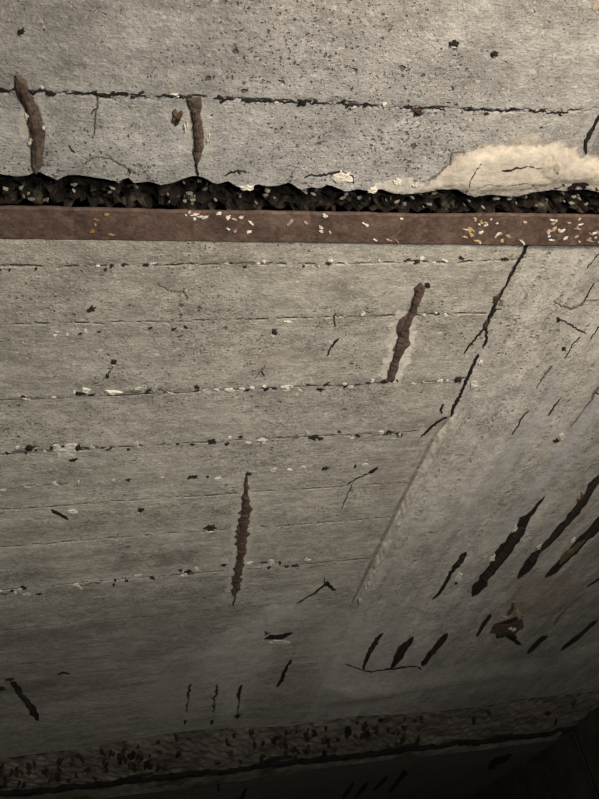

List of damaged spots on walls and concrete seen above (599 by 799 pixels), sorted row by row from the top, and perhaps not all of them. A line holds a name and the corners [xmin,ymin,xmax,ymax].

spalling [0,74,599,244]
crack [583,115,599,154]
crack [420,245,529,451]
spalling [471,494,552,597]
spalling [517,475,599,579]
spalling [432,552,467,600]
spalling [362,633,383,671]
spalling [390,637,414,669]
spalling [421,633,448,666]
spalling [476,603,548,654]